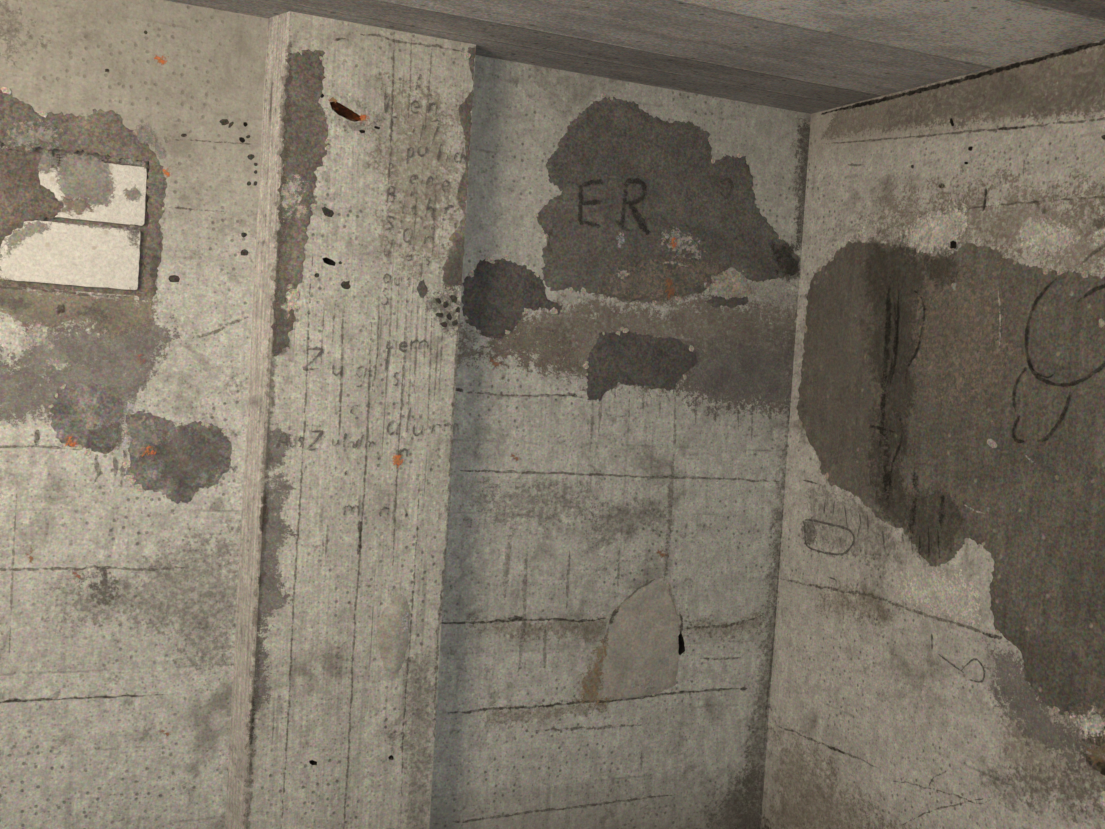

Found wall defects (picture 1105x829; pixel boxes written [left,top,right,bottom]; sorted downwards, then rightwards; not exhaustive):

peeling [0,87,180,302]
spalling [219,119,250,143]
peeling [271,48,342,357]
peeling [417,47,800,340]
peeling [49,383,236,504]
peeling [583,327,699,402]
peeling [796,241,1105,755]